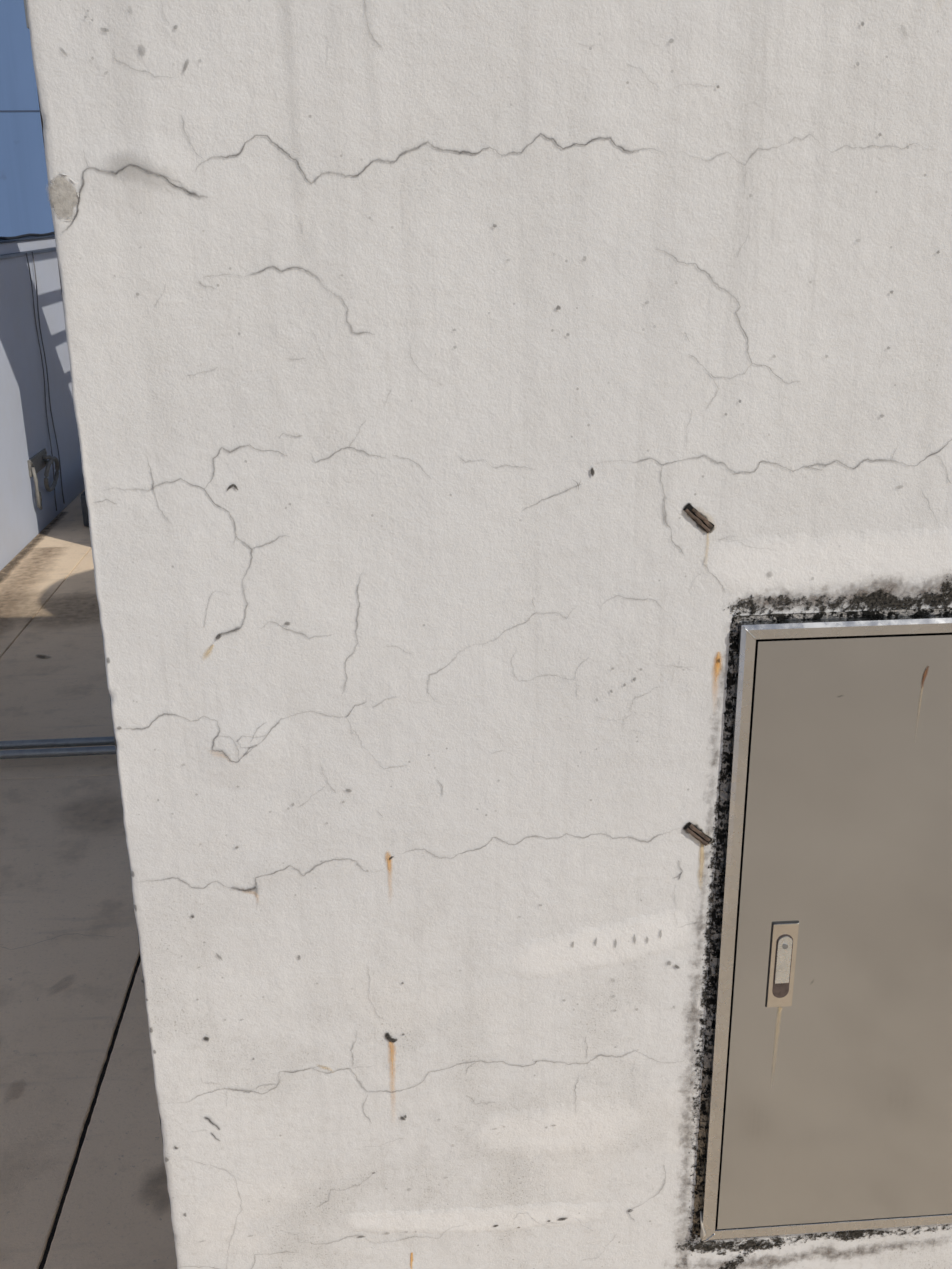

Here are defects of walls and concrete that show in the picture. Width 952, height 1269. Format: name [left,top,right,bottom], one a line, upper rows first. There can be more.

crack [221,135,307,180]
crack [348,133,630,177]
mould [727,578,952,643]
mould [675,713,951,1269]